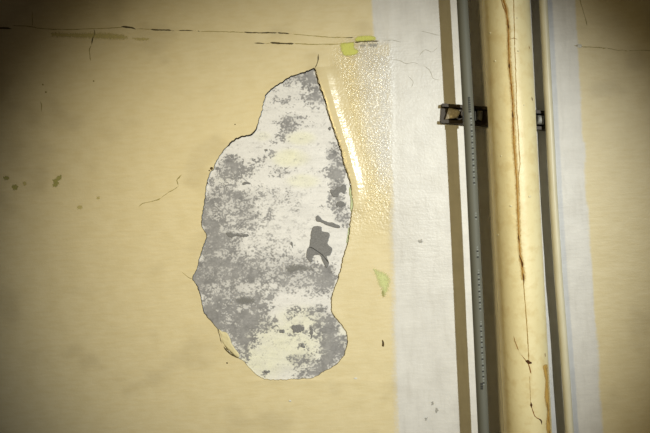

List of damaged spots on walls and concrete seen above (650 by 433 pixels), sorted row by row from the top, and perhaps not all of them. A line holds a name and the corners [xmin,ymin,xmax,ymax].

crack [0,13,399,67]
peeling [192,68,353,380]
rust [543,365,551,433]